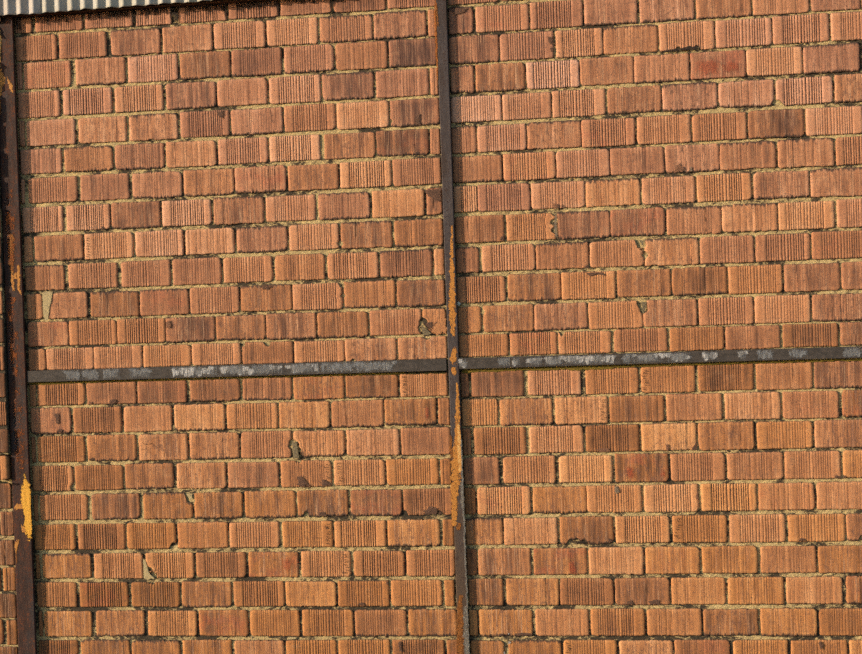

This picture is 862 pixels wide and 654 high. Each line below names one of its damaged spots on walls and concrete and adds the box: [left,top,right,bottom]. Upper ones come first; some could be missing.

rust [8,297,19,376]
rust [456,595,465,654]